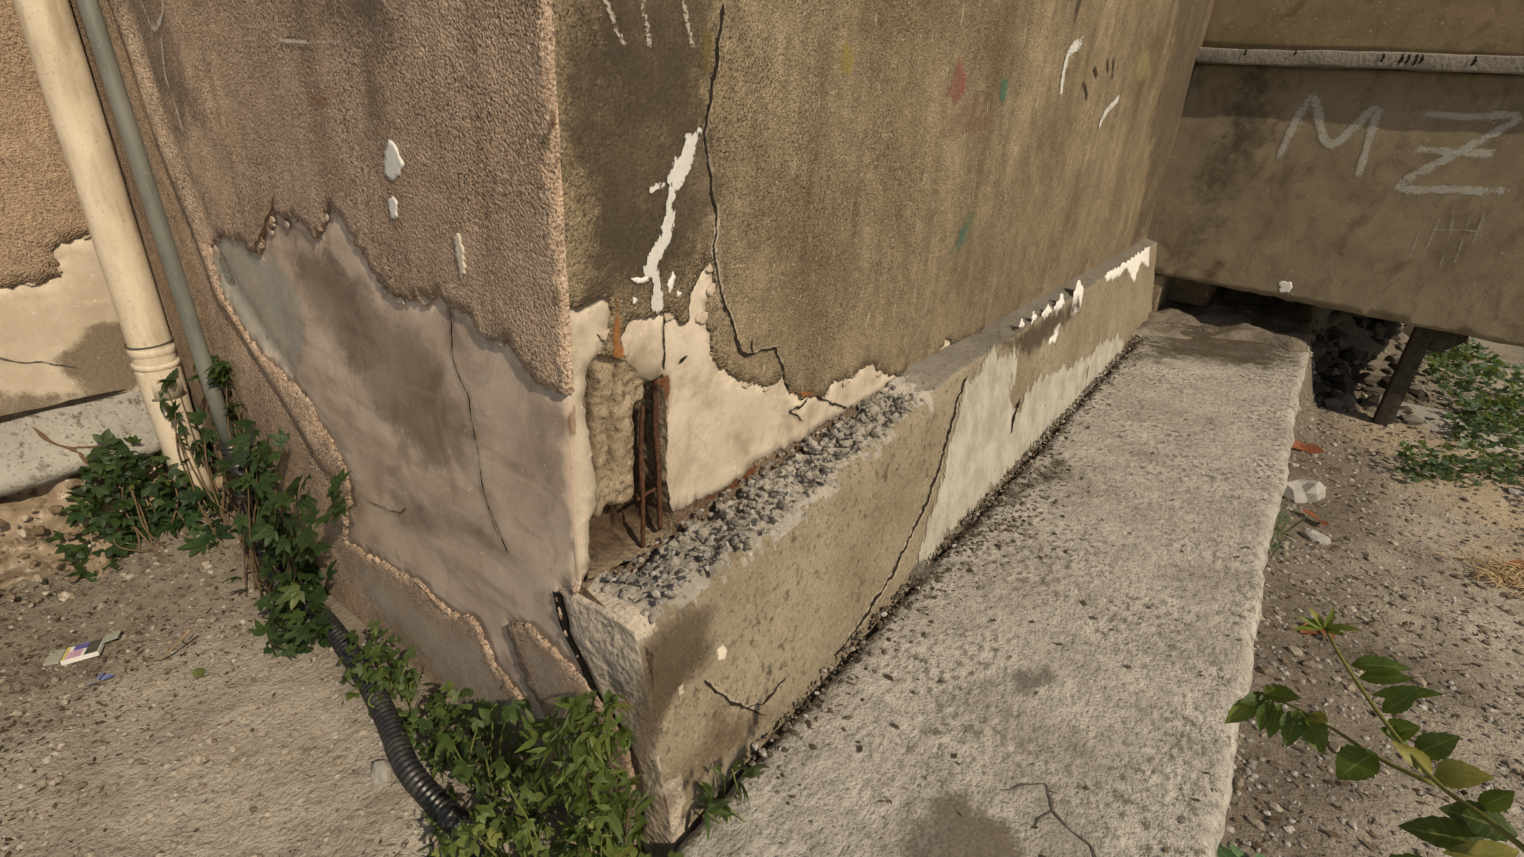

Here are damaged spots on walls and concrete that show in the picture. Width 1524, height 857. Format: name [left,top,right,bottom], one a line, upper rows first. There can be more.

crack [0,357,127,465]
flaking render [0,234,139,415]
crack [449,308,509,553]
flaking render [212,210,897,796]
rust [657,375,670,437]
crack [662,316,687,370]
crack [702,3,847,422]
crack [835,377,967,656]
crack [552,591,645,853]
crack [705,677,787,716]